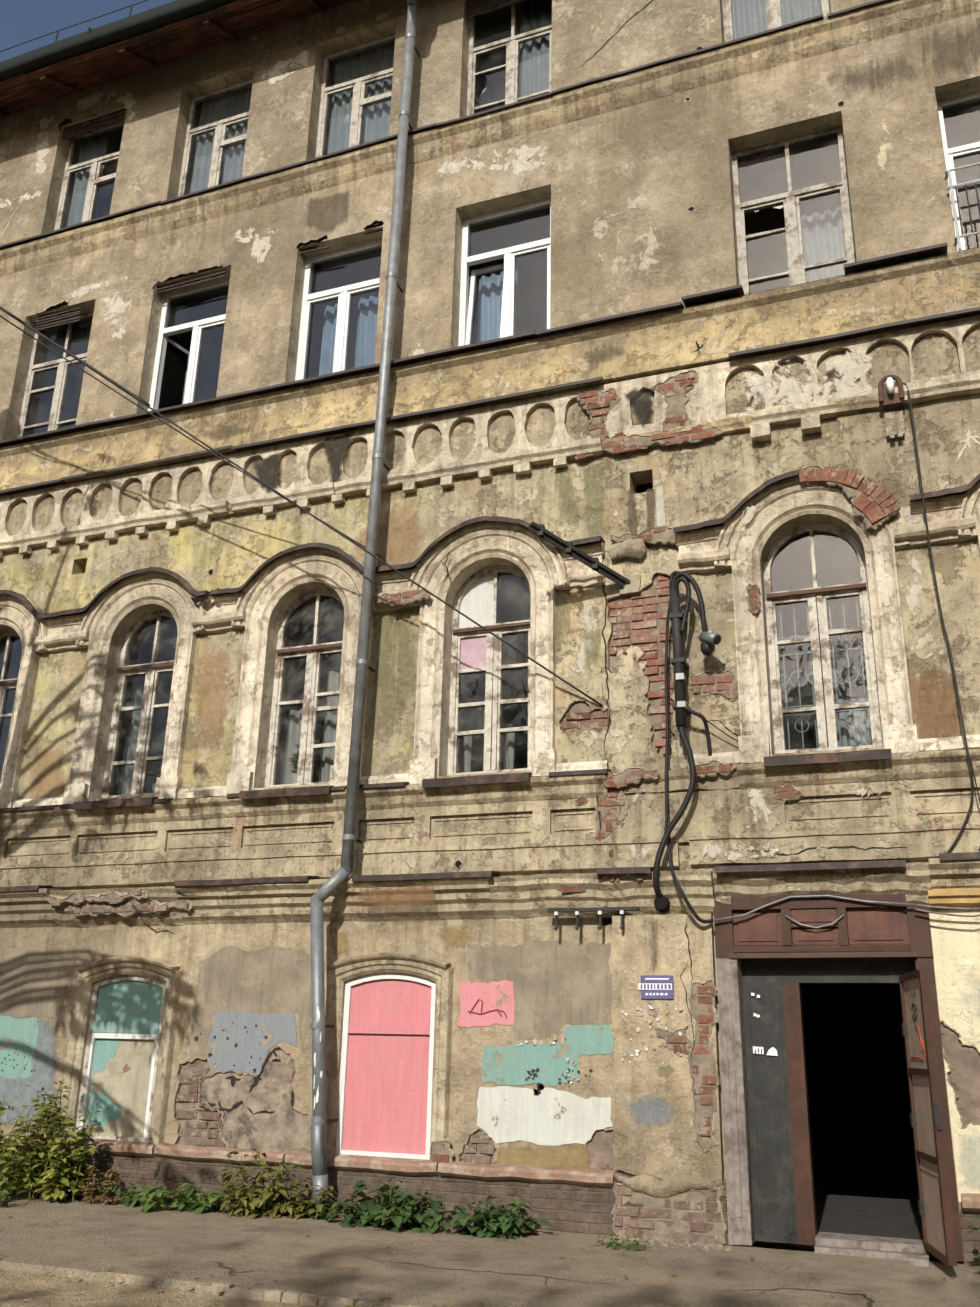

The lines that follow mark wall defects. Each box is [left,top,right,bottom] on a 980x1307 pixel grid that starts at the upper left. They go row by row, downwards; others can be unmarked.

peeling [259,50,311,84]
peeling [438,144,548,176]
peeling [234,227,278,267]
peeling [743,351,873,413]
flaking render [574,370,723,461]
flaking render [797,466,901,530]
crack [601,557,611,767]
flaking render [556,572,743,893]
crack [594,796,602,840]
flaking render [46,889,193,918]
peeling [173,945,312,1151]
flaking render [939,1020,980,1129]